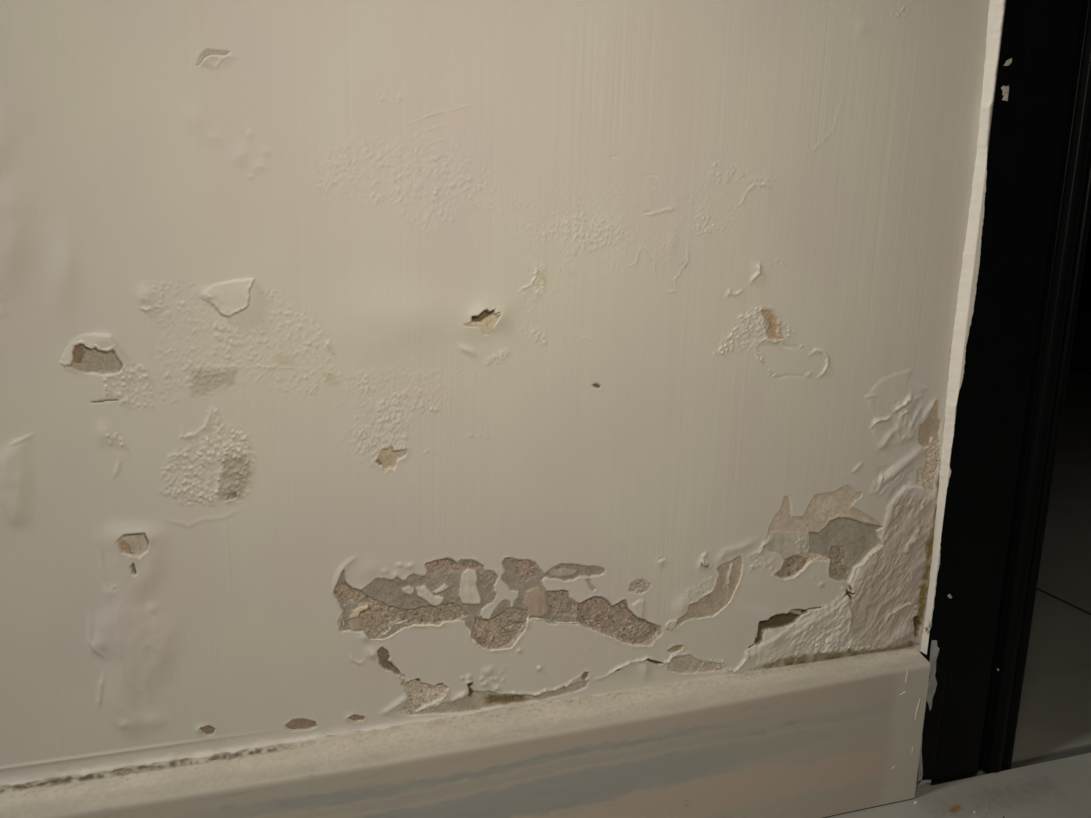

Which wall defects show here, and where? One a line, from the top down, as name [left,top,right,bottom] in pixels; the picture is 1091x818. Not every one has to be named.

peeling [205,276,258,314]
peeling [465,302,510,334]
peeling [60,328,157,412]
peeling [763,480,883,590]
peeling [330,552,747,666]